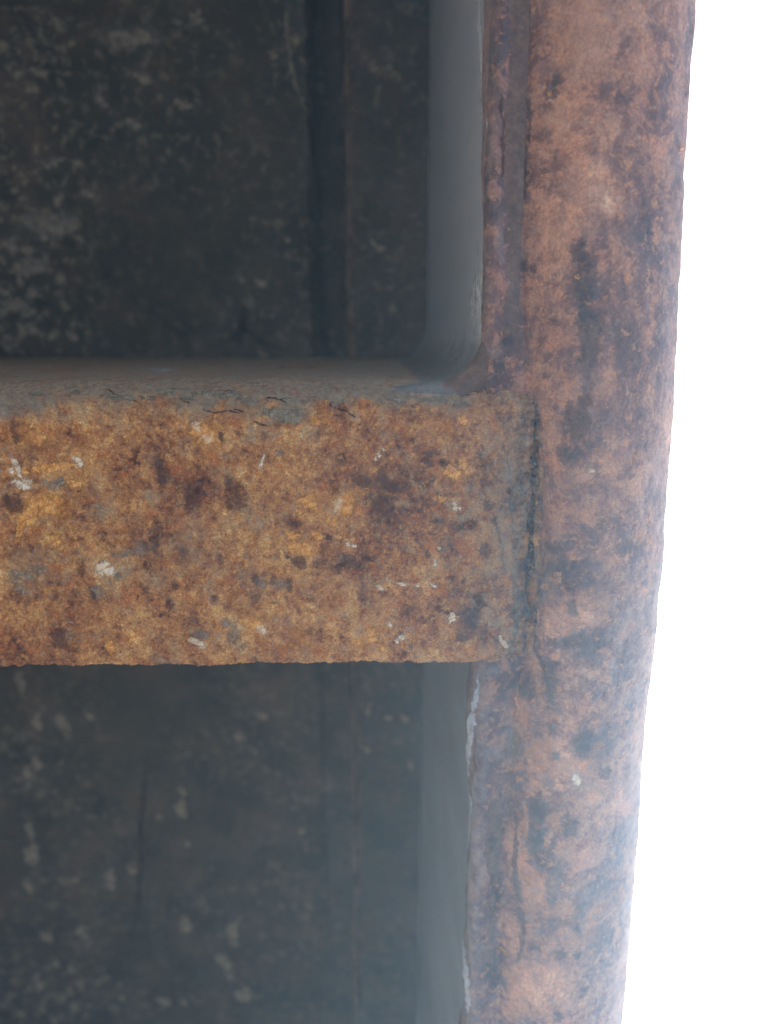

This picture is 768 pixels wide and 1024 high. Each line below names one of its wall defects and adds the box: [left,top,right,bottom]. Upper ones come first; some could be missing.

rust [2,461,88,542]
rust [186,422,224,448]
rust [224,478,246,510]
rust [284,466,404,569]
rust [422,455,468,481]
crack [526,452,538,570]
rust [535,379,614,485]
rust [184,625,221,649]
rust [505,661,591,787]